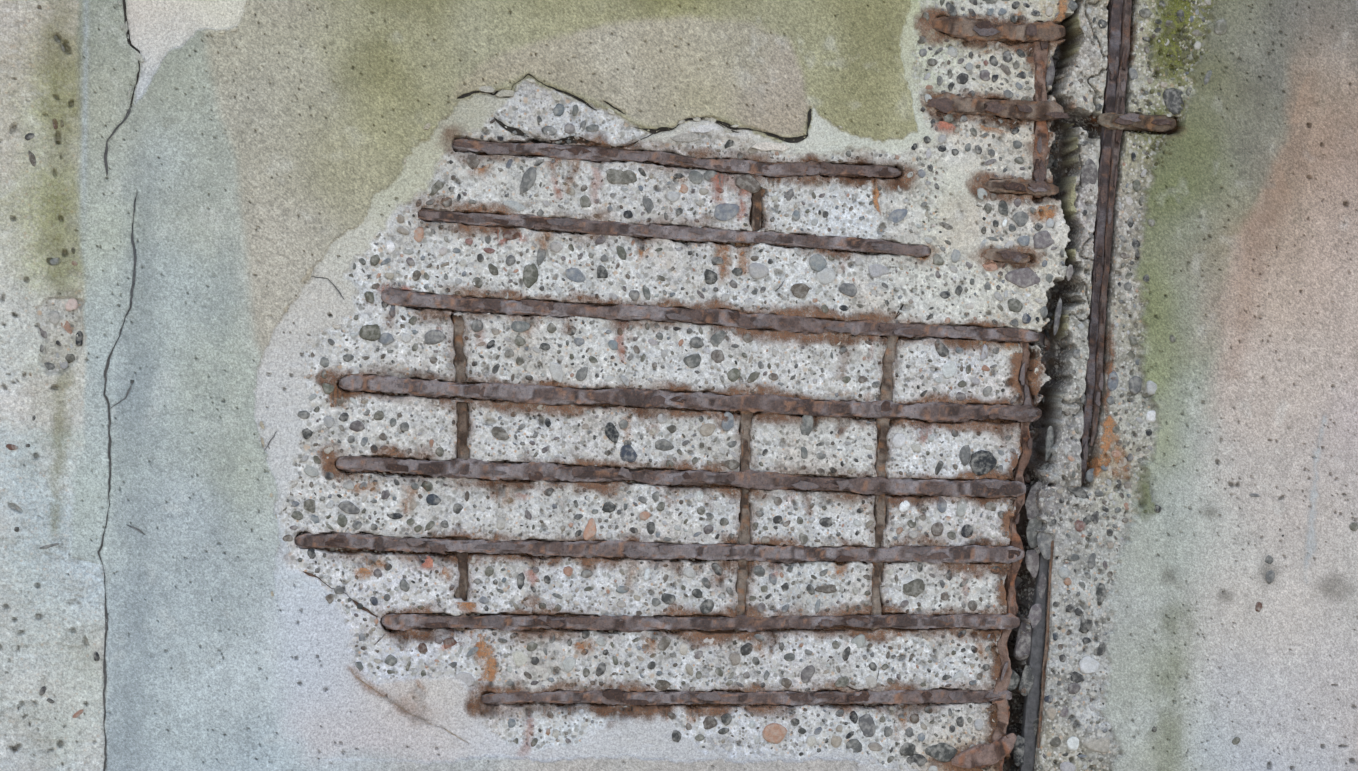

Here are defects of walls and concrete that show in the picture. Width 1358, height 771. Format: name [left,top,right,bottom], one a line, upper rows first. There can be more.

crack [104,0,140,176]
peeling [118,0,249,108]
rust [740,155,916,218]
rust [924,91,1076,221]
rust [461,288,913,352]
rust [427,376,852,433]
spalling [253,0,1227,771]
crack [98,190,145,771]
rust [460,459,763,498]
rust [406,532,623,579]
rust [649,321,1044,771]
rust [388,598,932,724]